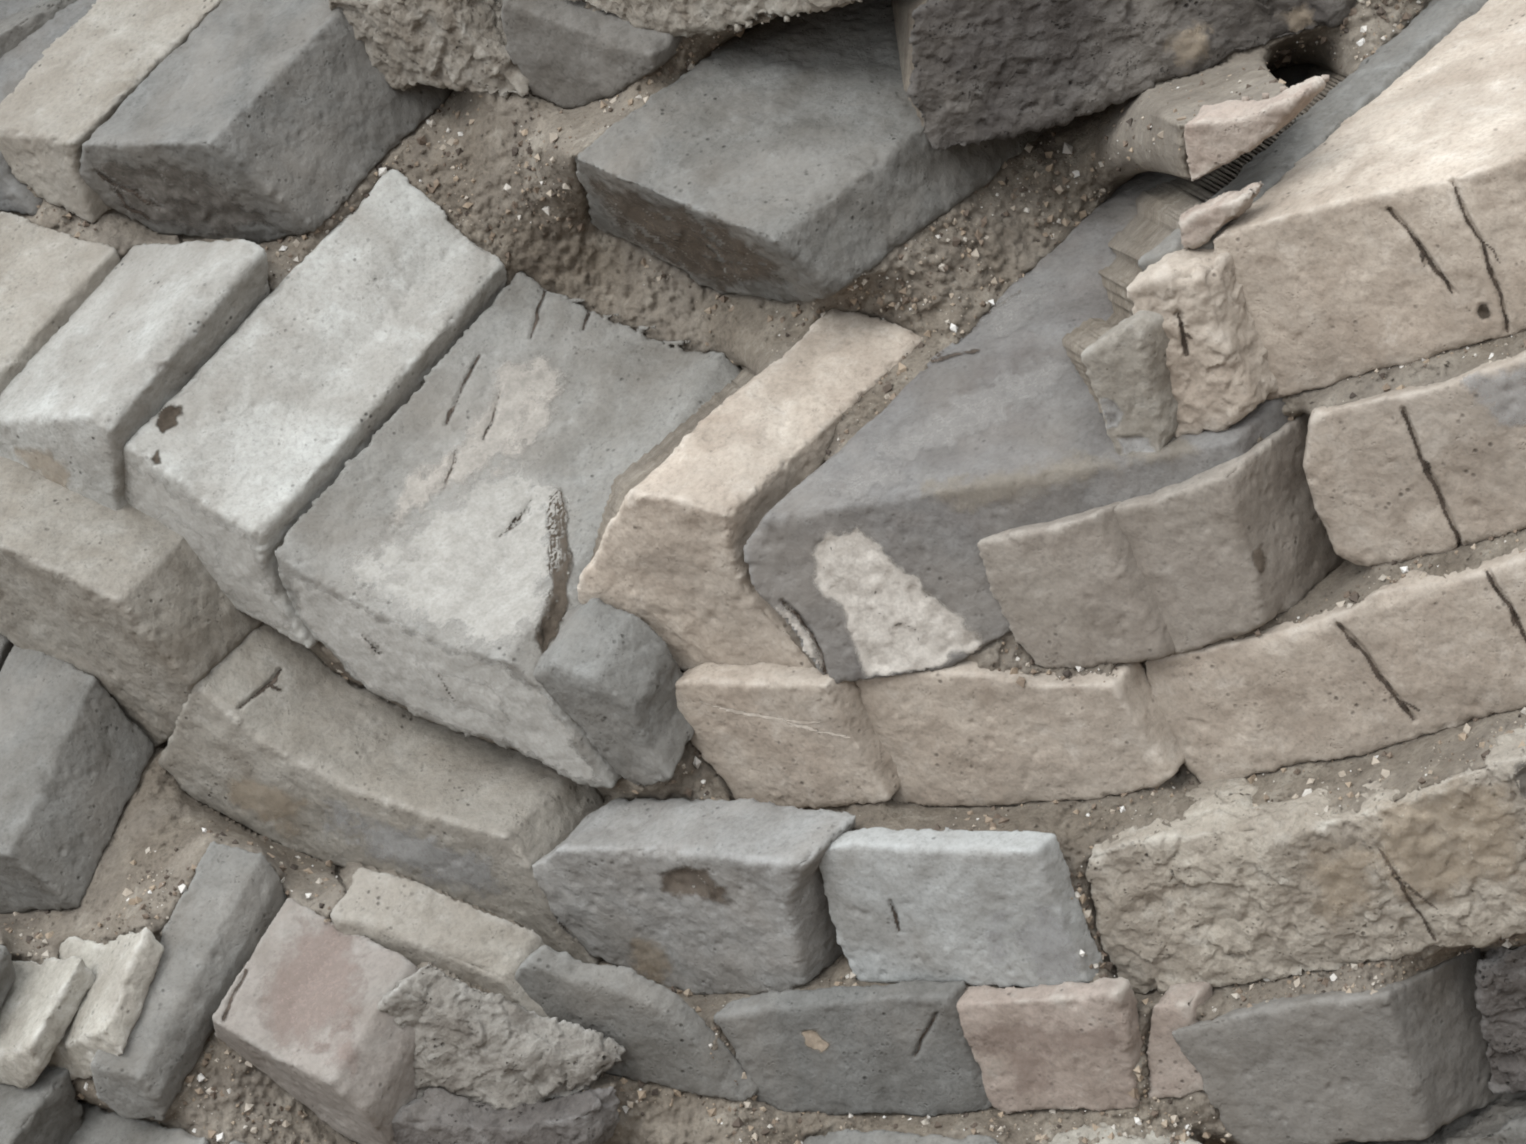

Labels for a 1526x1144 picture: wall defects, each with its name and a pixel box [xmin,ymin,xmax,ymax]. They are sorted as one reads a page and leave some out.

crack [1387,208,1453,293]
crack [1452,183,1509,332]
crack [1401,410,1461,544]
crack [1486,571,1526,641]
crack [1337,624,1420,720]